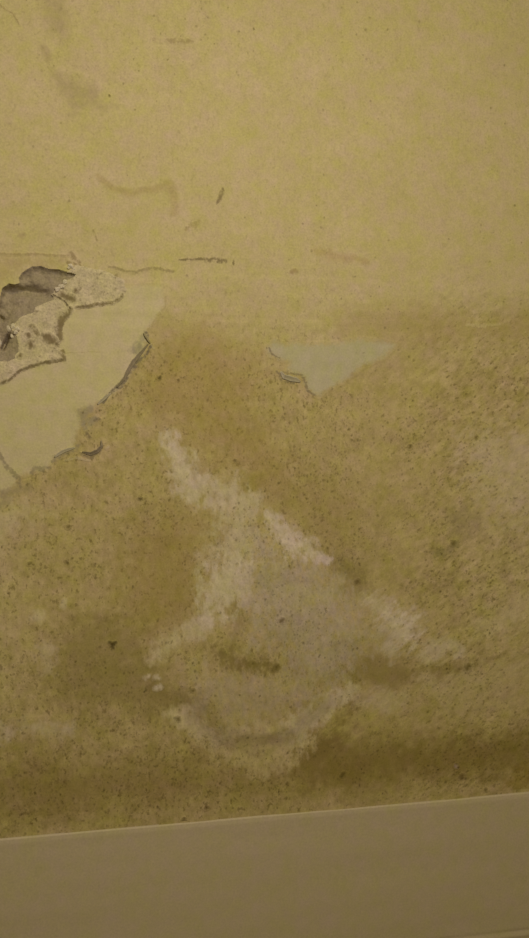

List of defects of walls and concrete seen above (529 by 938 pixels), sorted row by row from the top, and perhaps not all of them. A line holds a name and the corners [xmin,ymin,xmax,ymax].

damp [0,231,70,296]
damp [310,290,529,356]
peeling [263,335,400,401]
peeling [0,263,170,568]
damp [0,308,529,835]